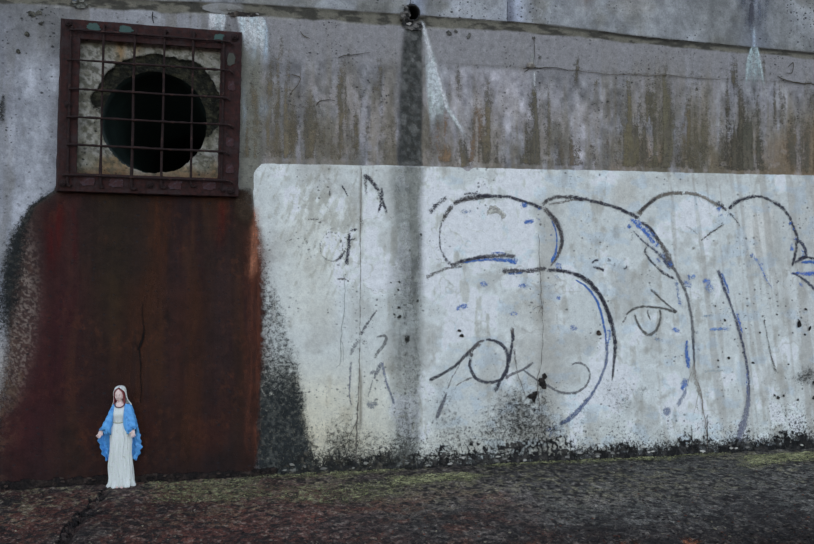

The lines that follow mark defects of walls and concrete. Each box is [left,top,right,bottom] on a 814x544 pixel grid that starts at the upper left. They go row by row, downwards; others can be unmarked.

water stain [520,68,710,169]
water stain [719,0,814,173]
water stain [0,191,53,346]
rust [0,178,267,482]
water stain [256,24,505,475]
water stain [436,380,566,460]